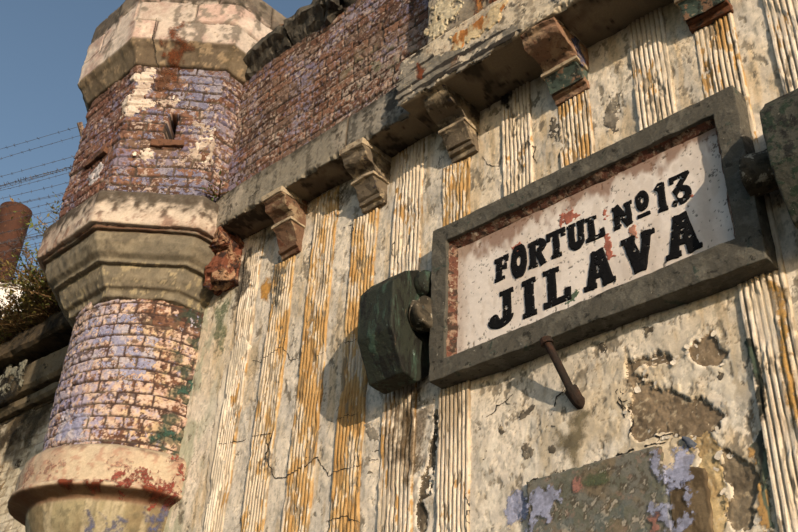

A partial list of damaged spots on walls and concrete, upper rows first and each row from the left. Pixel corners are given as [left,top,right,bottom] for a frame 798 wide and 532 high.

rust [155,21,194,92]
peeling [395,0,523,106]
peeling [87,67,233,195]
crack [218,421,377,479]
flaking render [521,442,534,460]
flaking render [622,330,762,532]
rust [58,478,73,490]
rust [83,479,102,494]
rust [142,484,170,502]
peeling [504,485,563,532]